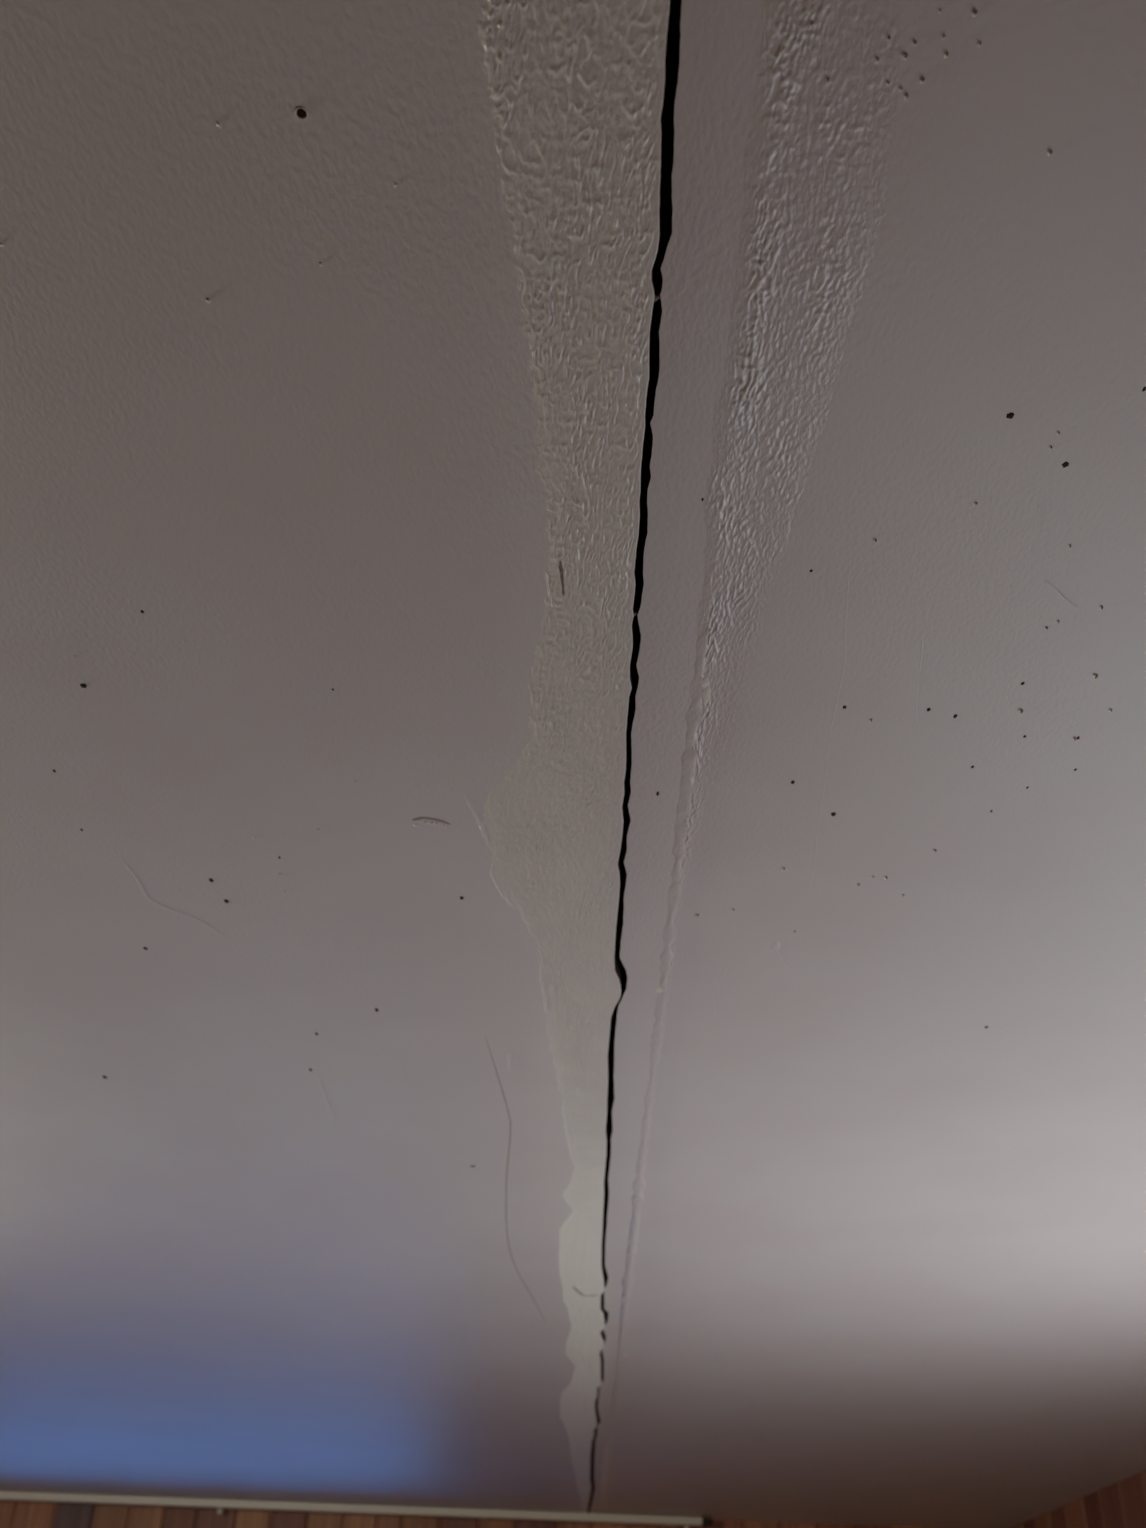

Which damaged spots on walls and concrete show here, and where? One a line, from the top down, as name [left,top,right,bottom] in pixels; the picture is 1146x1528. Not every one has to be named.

crack [485,1037,546,1323]
crack [587,0,682,1513]